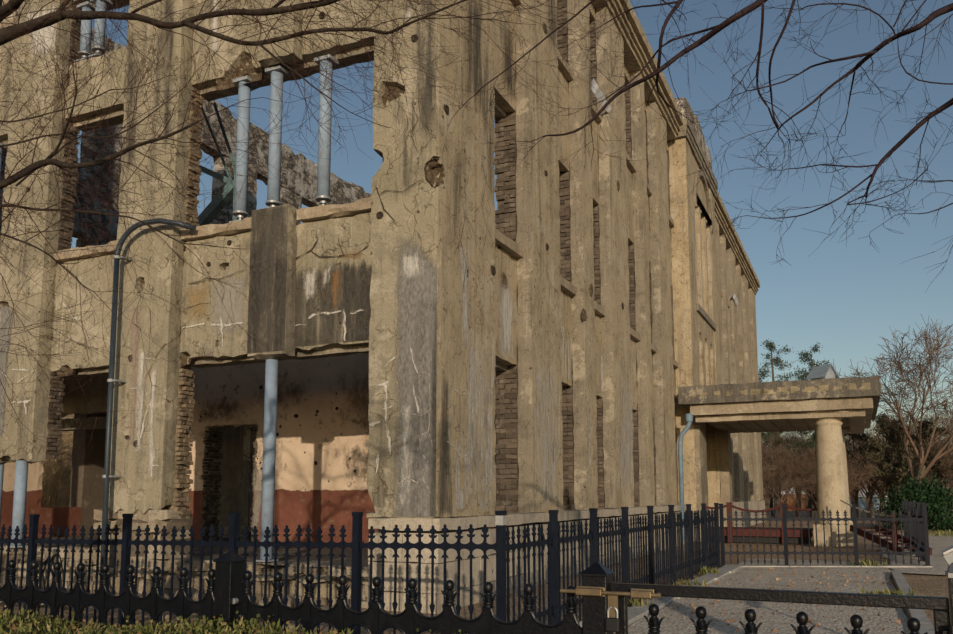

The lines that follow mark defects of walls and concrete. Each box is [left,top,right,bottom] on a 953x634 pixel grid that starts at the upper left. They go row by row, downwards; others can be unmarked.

spalling [382,85,405,108]
spalling [425,157,445,188]
crack [295,238,368,259]
damp [247,205,371,354]
damp [403,257,419,276]
crack [183,269,244,347]
crack [297,310,364,340]
crack [129,343,166,438]
crack [369,348,471,492]